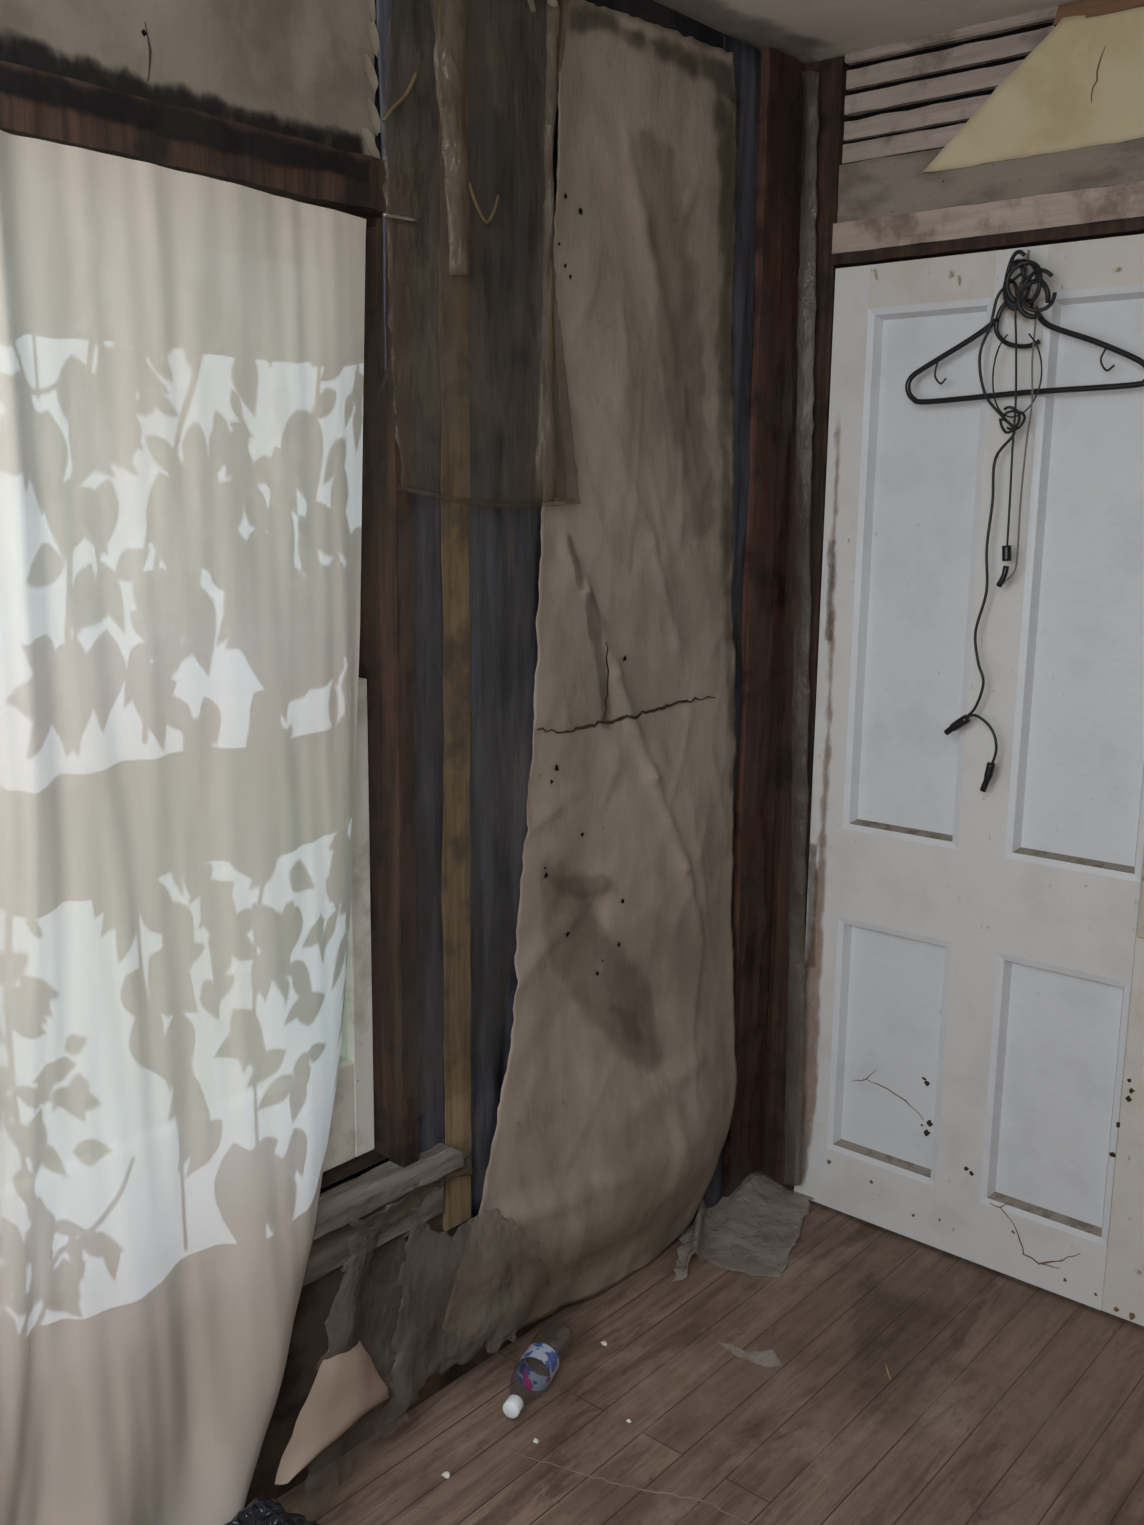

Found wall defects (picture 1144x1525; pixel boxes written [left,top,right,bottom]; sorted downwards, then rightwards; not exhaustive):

peeling [528,0,558,13]
leakage [0,65,367,181]
crack [537,642,716,734]